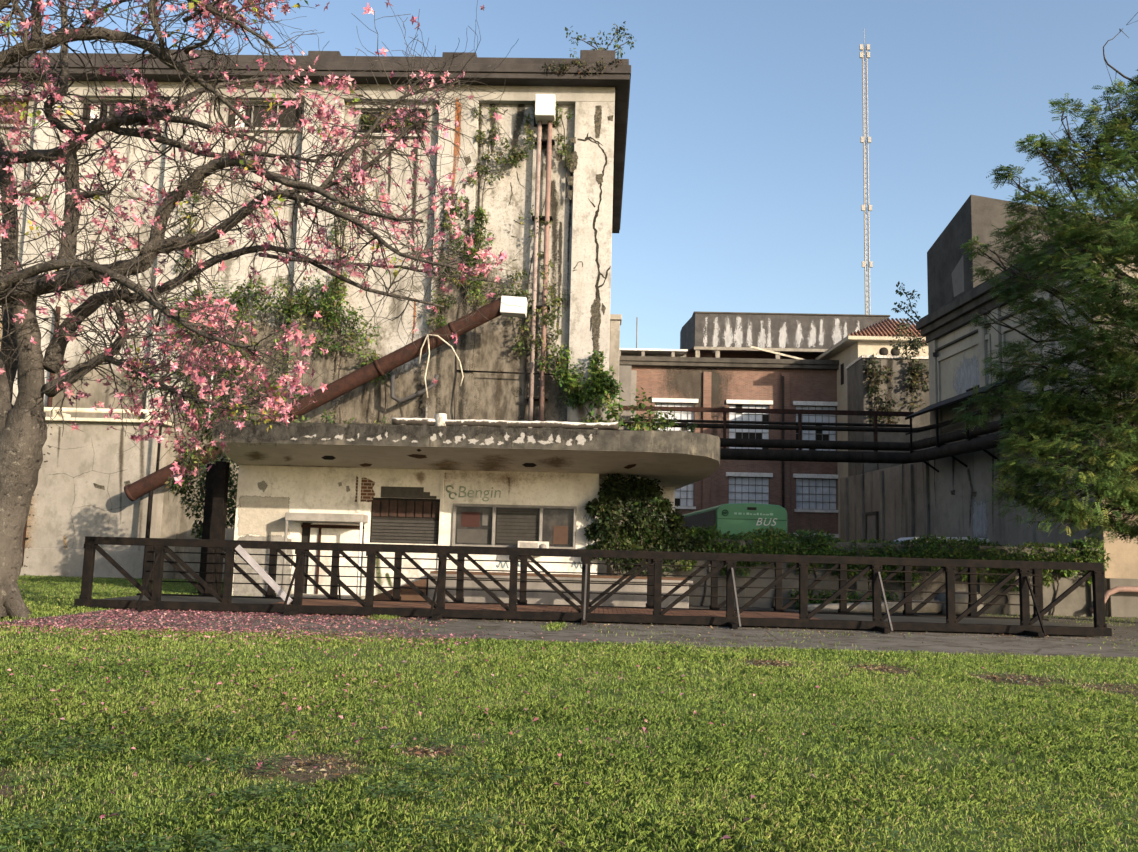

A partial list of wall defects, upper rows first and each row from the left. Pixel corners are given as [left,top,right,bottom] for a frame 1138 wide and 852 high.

leakage [511,104,525,151]
leakage [437,192,445,329]
peeling [419,247,518,335]
leakage [461,104,496,317]
leakage [541,127,572,326]
crack [577,133,611,350]
peeling [217,309,382,421]
leakage [210,332,601,445]
peeling [292,308,593,459]
flaking render [338,463,375,502]